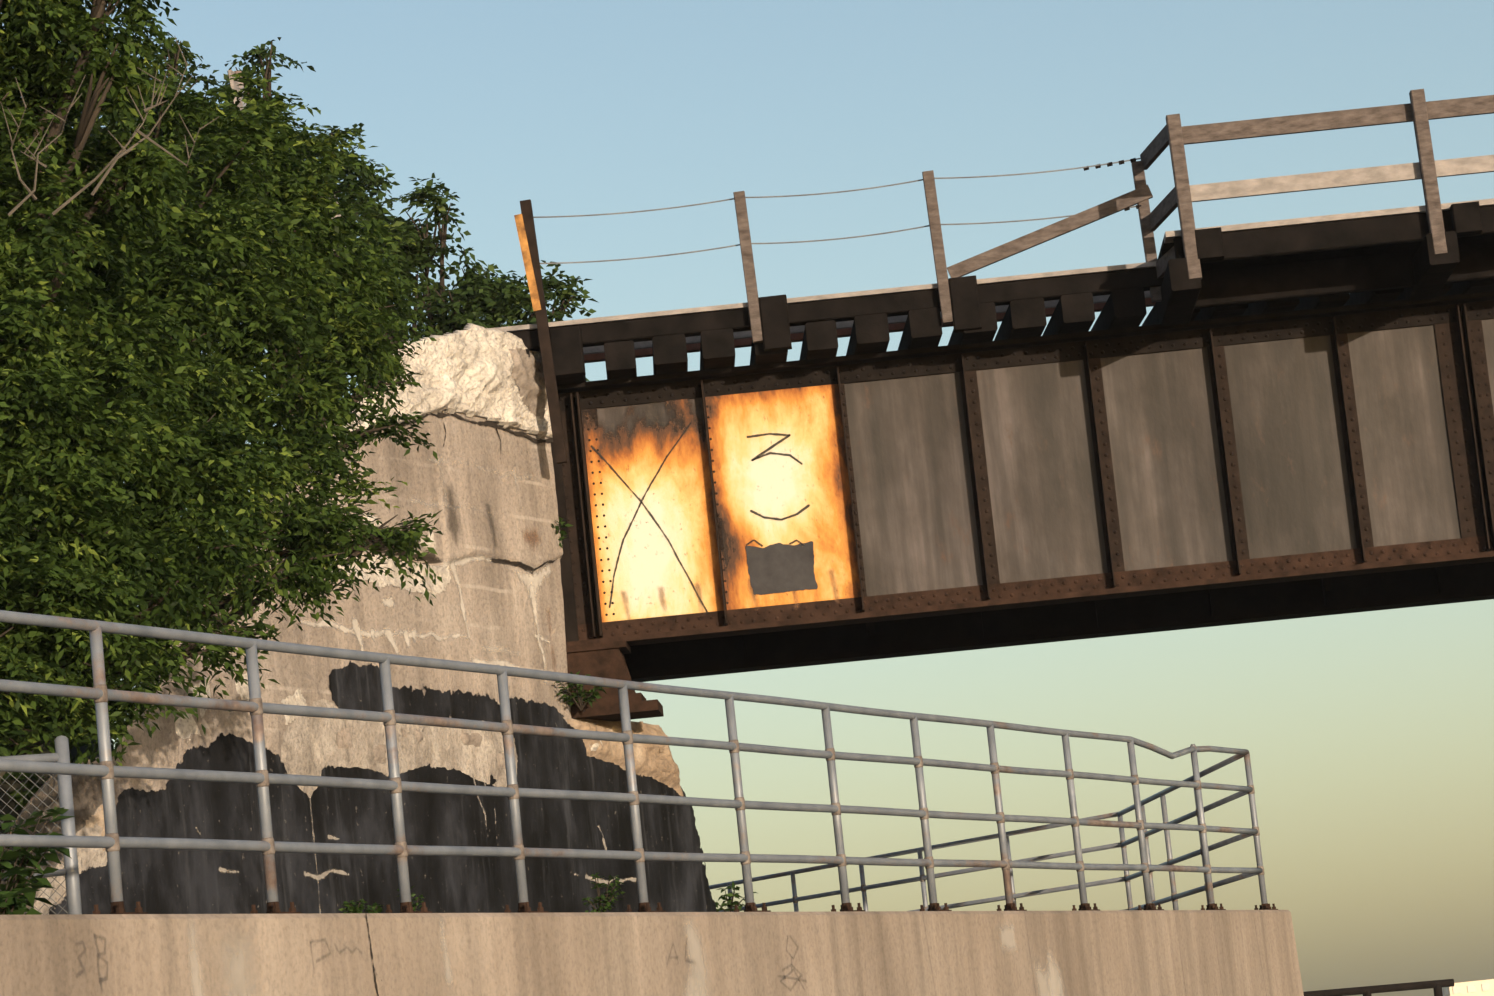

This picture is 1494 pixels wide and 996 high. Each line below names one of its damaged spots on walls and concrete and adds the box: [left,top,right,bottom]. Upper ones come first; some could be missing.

rust [582,384,861,622]
spalling [336,512,451,598]
peeling [119,646,518,826]
spalling [567,719,683,797]
peeling [30,804,107,915]
spalling [304,869,349,880]
crack [366,914,382,996]